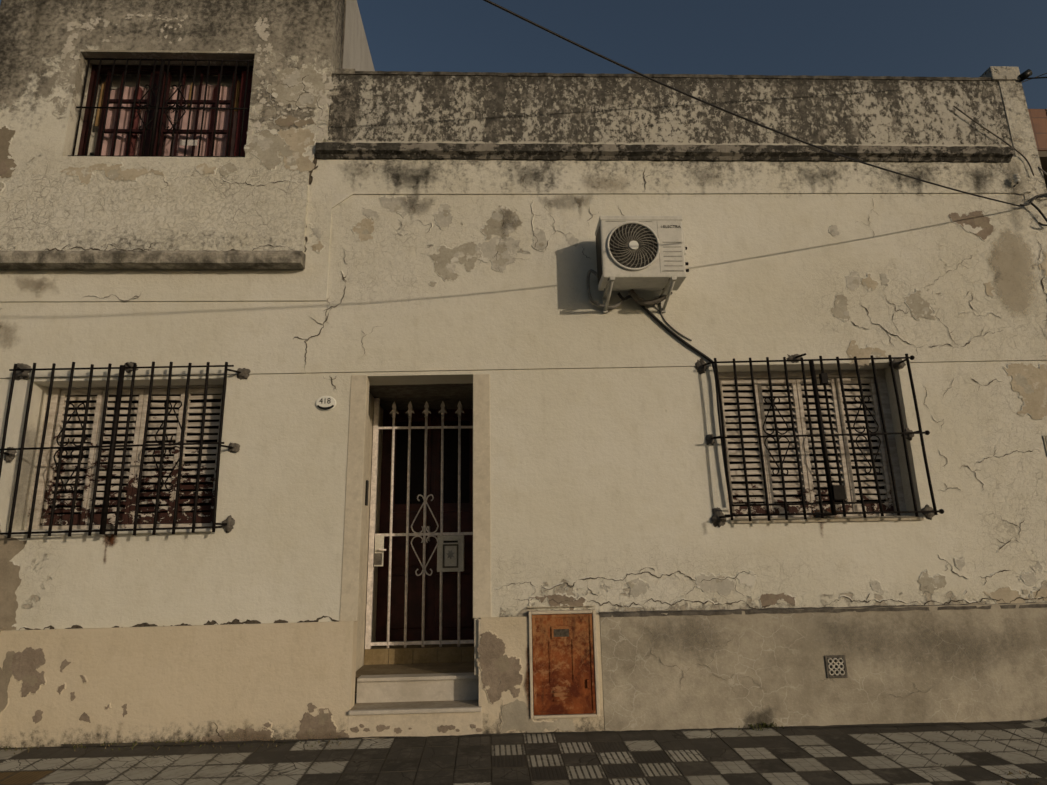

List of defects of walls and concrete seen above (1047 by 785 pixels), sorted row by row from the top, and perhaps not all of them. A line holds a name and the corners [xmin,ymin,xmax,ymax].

flaking render [244,17,337,173]
flaking render [0,125,17,193]
peeling [428,203,547,287]
peeling [949,211,994,242]
crack [293,247,350,391]
crack [852,254,1002,360]
crack [924,375,1040,491]
flaking render [1002,362,1047,420]
flaking render [0,519,27,631]
flaking render [0,647,88,724]
flaking render [476,630,524,705]
corrosion [525,647,534,709]